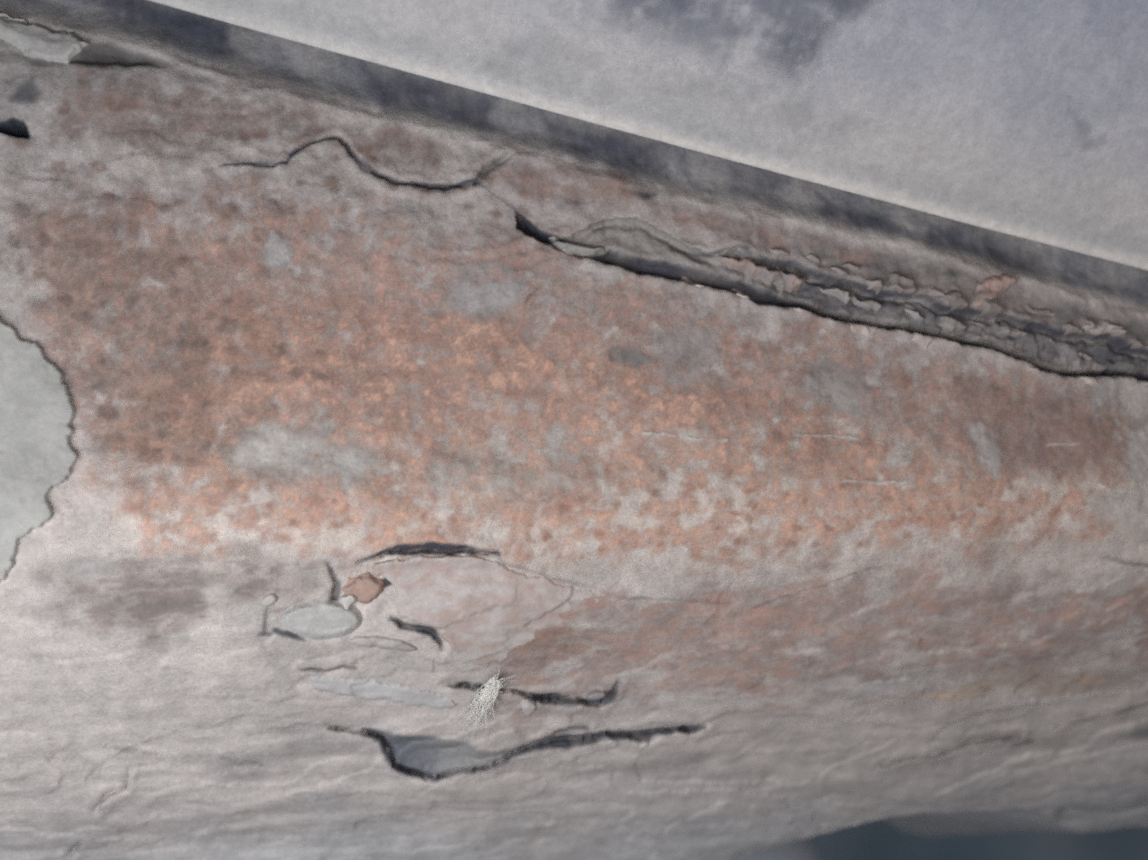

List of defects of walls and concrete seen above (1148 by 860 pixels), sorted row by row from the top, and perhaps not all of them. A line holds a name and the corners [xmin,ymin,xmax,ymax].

crack [0,119,30,138]
crack [242,143,310,167]
crack [338,139,484,191]
spalling [516,213,1148,417]
peeling [0,317,79,582]
rust [112,304,1117,562]
peeling [969,423,1000,475]
peeling [1126,422,1148,511]
rust [94,562,202,622]
spalling [281,543,609,667]